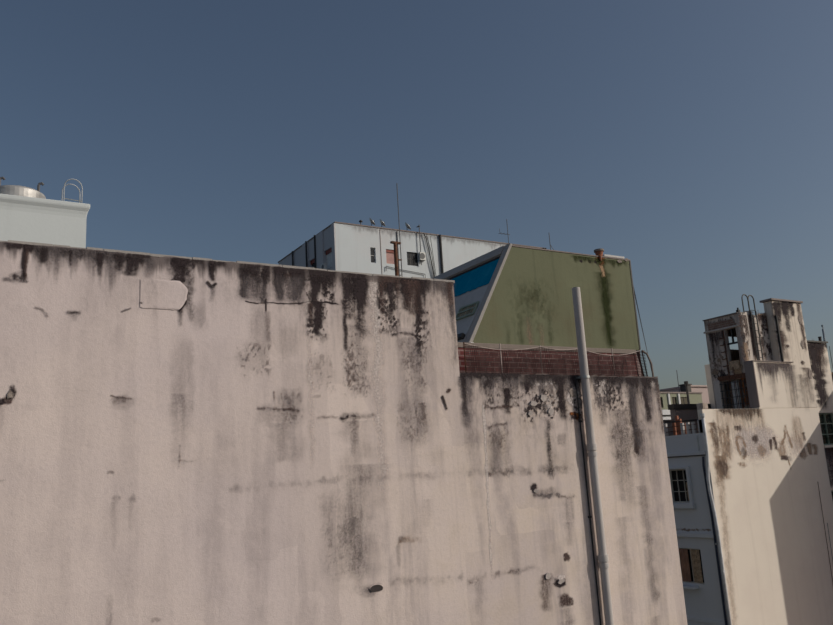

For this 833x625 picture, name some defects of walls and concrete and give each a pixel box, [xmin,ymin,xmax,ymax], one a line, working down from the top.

damp [4,243,153,282]
damp [169,257,226,315]
damp [600,264,611,343]
damp [240,263,456,476]
damp [709,330,727,367]
damp [739,311,794,384]
damp [772,302,828,407]
damp [459,372,581,569]
damp [593,376,662,454]
peeling [716,426,804,477]